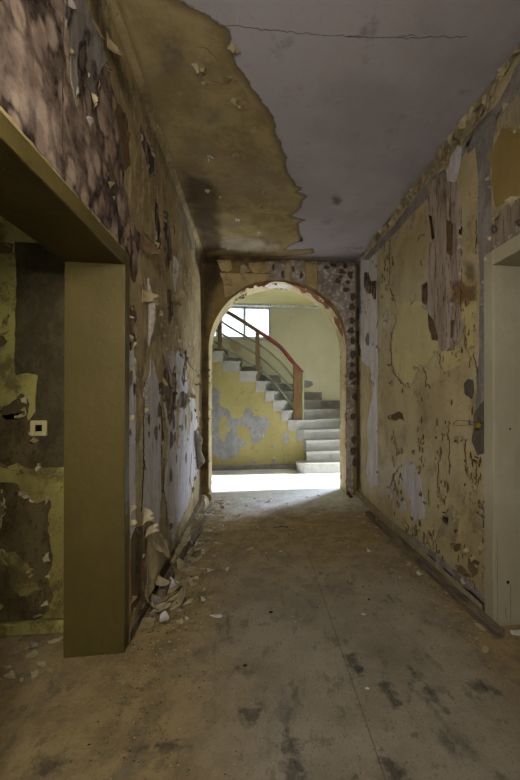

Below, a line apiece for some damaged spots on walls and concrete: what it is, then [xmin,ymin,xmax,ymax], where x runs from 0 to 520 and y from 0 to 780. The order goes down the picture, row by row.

leakage [0,0,140,283]
peeling [115,105,155,178]
crack [230,25,466,40]
peeling [129,198,274,617]
peeling [356,43,520,612]